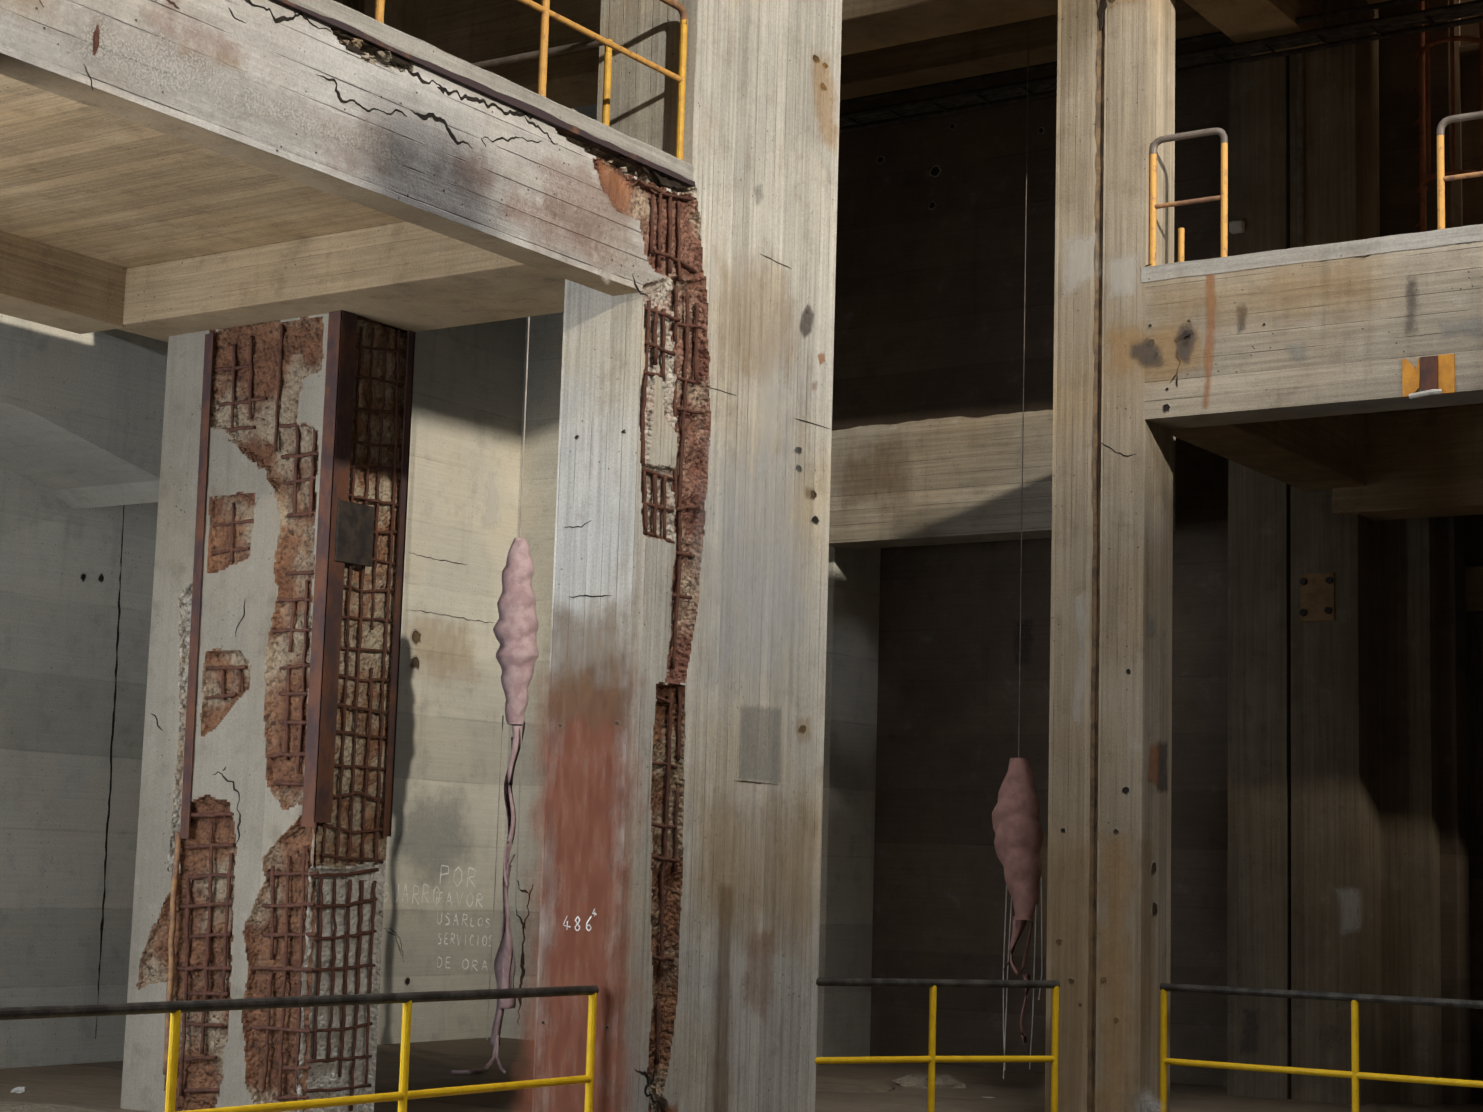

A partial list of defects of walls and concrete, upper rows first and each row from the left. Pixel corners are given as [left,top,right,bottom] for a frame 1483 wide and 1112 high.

crack [228,0,331,32]
crack [315,55,559,148]
rust [1205,274,1215,407]
spalling [548,124,711,1112]
spalling [136,316,422,1112]
crack [516,880,533,1025]
rust [523,670,637,1112]